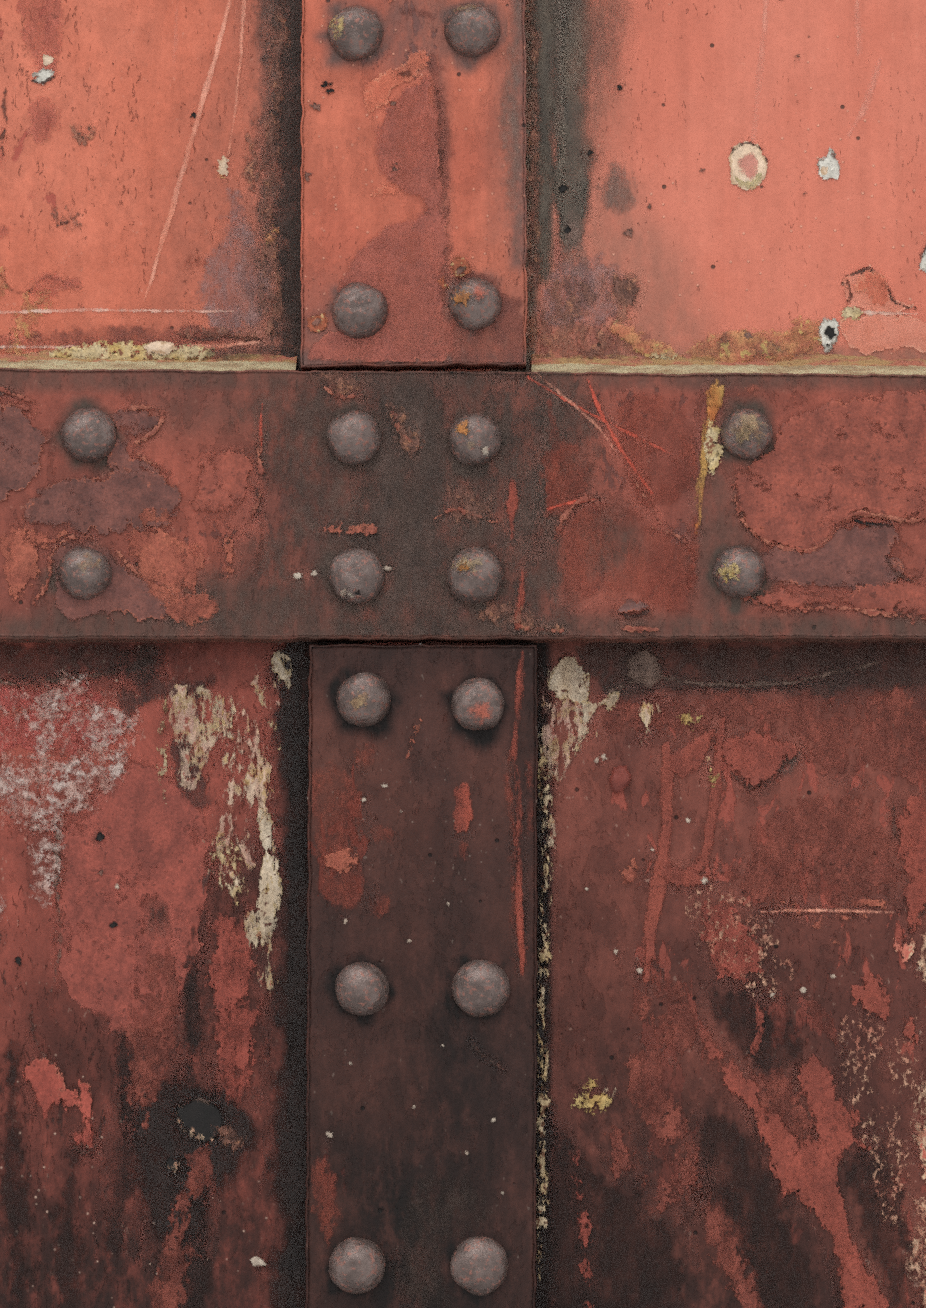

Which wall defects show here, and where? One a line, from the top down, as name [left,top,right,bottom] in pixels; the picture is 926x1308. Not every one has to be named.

damp [546,0,603,276]
peeling [728,141,768,190]
corrosion [602,272,819,363]
corrosion [839,306,864,322]
peeling [818,267,926,355]
peeling [731,390,926,624]
peeling [59,657,215,752]
peeling [51,761,259,1131]
peeling [891,796,926,981]
peeling [149,1098,244,1308]
peeling [604,968,926,1308]